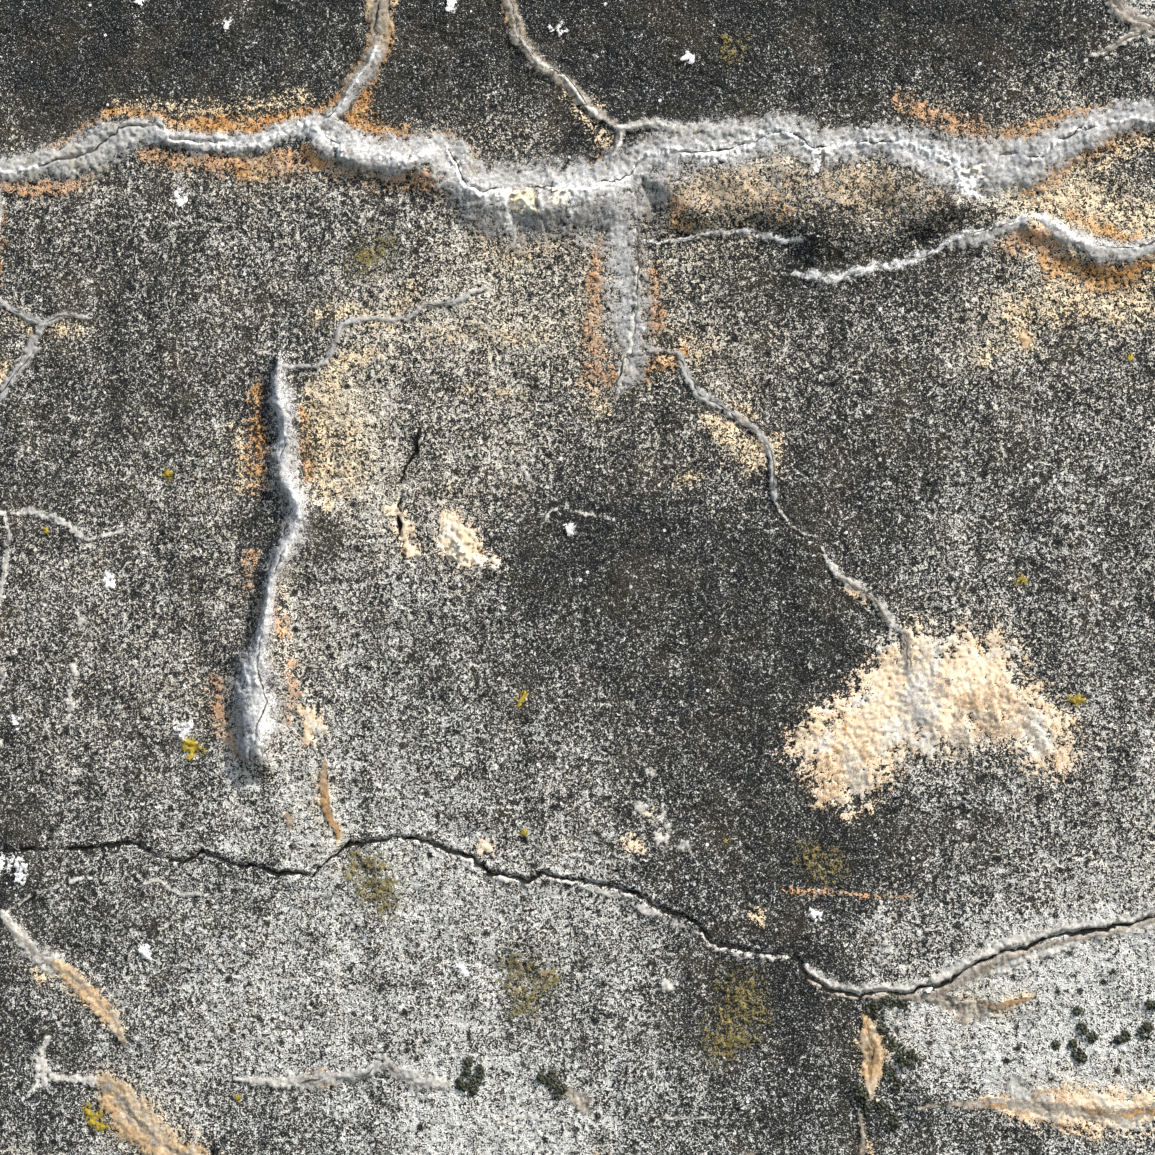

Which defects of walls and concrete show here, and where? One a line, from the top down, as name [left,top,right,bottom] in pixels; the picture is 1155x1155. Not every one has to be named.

corrosion [43,0,477,157]
corrosion [887,87,1112,141]
corrosion [0,166,110,202]
corrosion [135,142,451,204]
corrosion [973,129,1155,368]
crack [0,0,1155,672]
spalling [383,502,503,570]
crack [0,667,8,690]
spalling [773,614,1090,826]
crack [0,836,1155,1064]
crack [662,1114,716,1122]
crack [854,1109,875,1155]